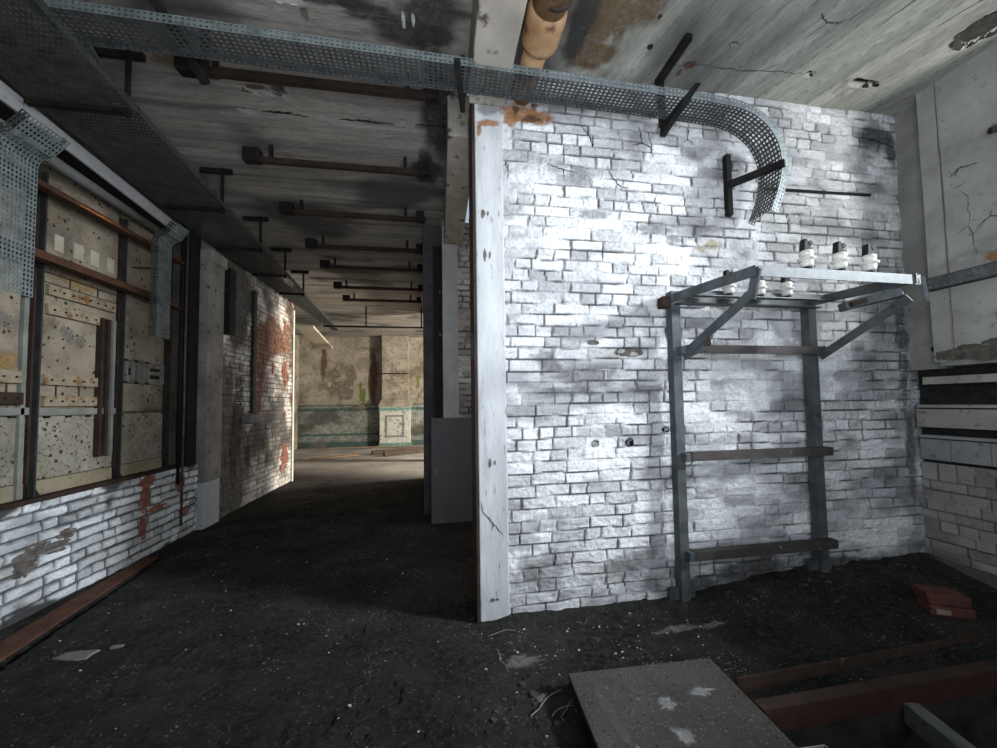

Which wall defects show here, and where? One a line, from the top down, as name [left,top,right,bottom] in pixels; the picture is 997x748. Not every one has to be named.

leakage [341,0,460,48]
spalling [948,11,997,51]
rust [477,103,552,135]
crack [934,87,997,354]
peeling [271,318,291,380]
peeling [0,527,77,580]